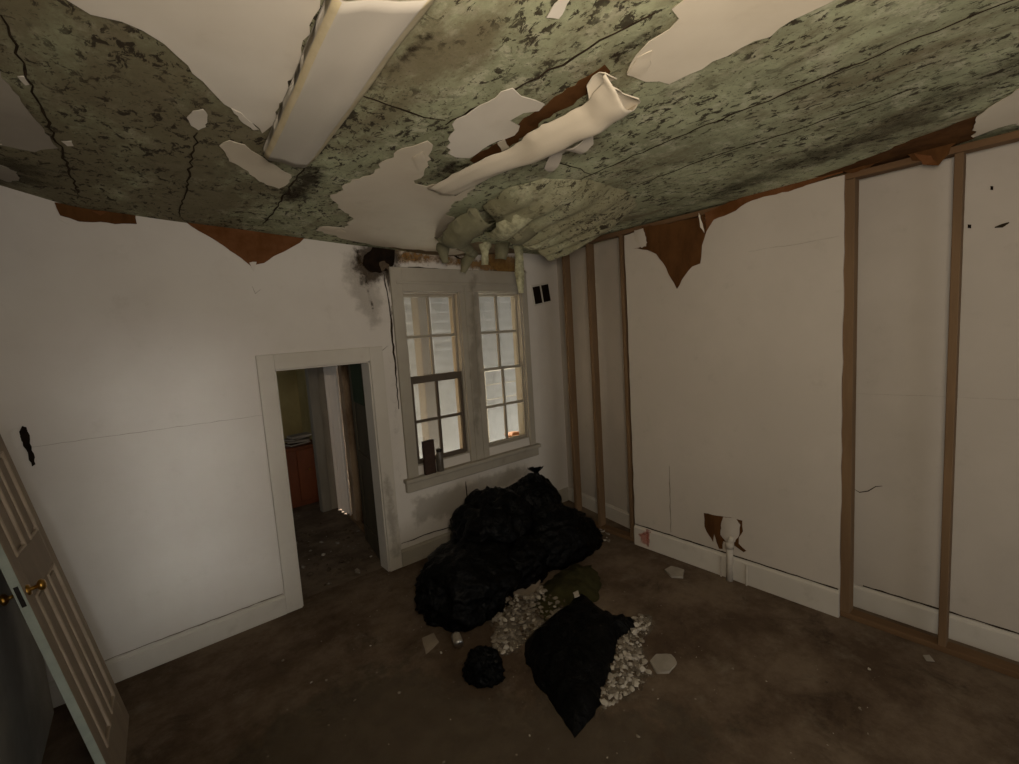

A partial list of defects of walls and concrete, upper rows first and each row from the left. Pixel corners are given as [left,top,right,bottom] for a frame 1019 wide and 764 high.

peeling [0,72,73,152]
crack [0,15,79,194]
flaking render [54,202,137,224]
crack [178,132,199,216]
peeling [67,0,320,133]
flaking render [188,223,304,271]
peeling [219,140,292,189]
mould [282,167,328,201]
peeling [316,0,834,293]
flaking render [634,88,1019,288]
mould [712,98,943,199]
flaking render [704,513,746,552]